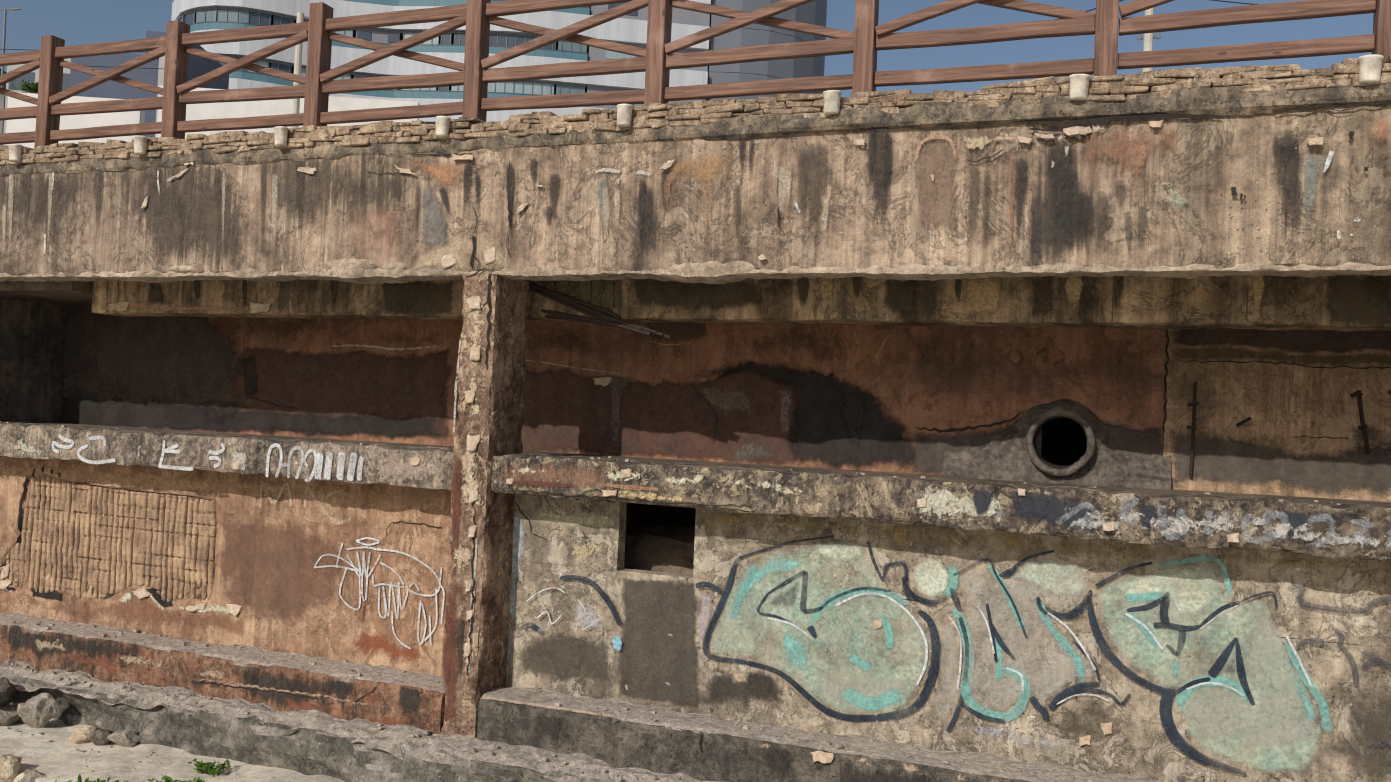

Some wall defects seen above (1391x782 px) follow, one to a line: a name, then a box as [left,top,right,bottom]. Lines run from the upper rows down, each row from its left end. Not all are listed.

leakage [595,168,666,252]
leakage [794,144,826,232]
leakage [867,127,892,218]
leakage [1009,141,1107,262]
leakage [1124,207,1146,247]
leakage [1273,131,1334,231]
spalling [0,440,242,617]
peeling [509,515,524,617]
peeling [916,486,1001,522]
peeling [1067,509,1391,548]